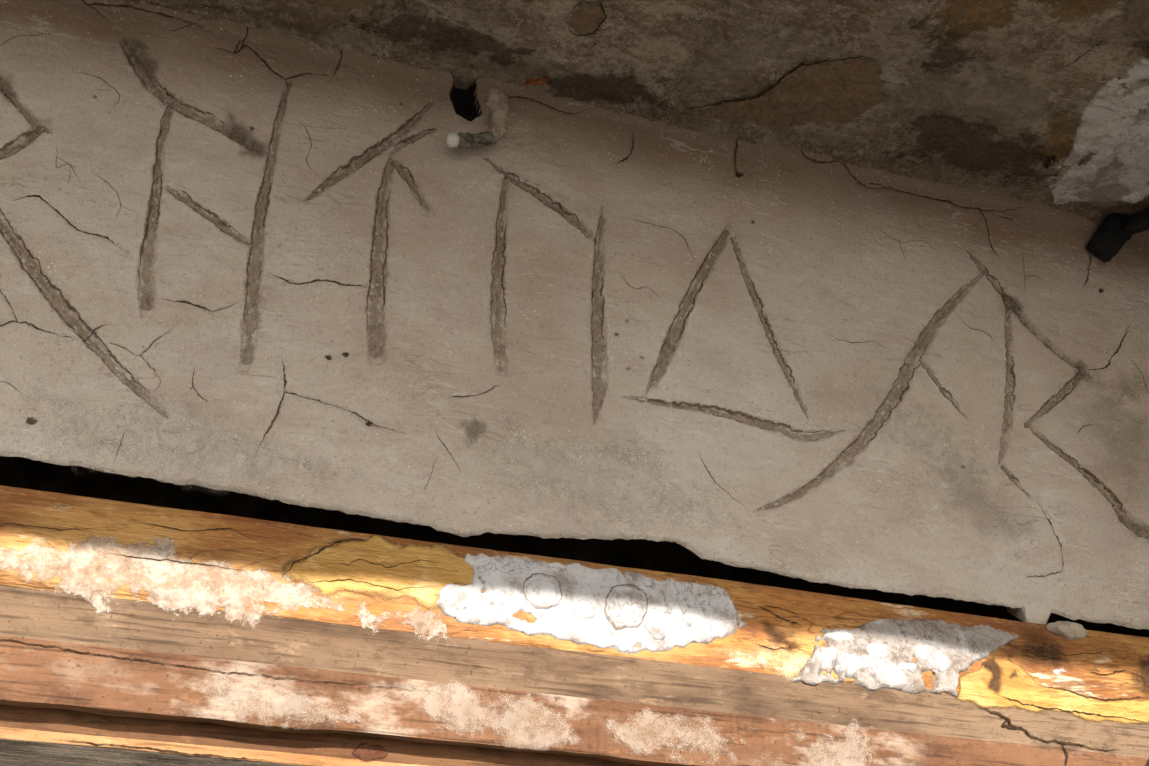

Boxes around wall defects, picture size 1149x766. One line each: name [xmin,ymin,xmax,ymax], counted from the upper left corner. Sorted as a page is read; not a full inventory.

crack [81,0,203,31]
crack [218,26,343,87]
crack [689,56,883,110]
peeling [1047,58,1149,205]
crack [12,146,136,250]
crack [801,149,1043,293]
crack [271,273,366,288]
crack [0,274,238,391]
crack [1085,327,1148,391]
crack [251,361,402,461]
crack [1027,513,1064,577]
crack [974,652,1149,766]